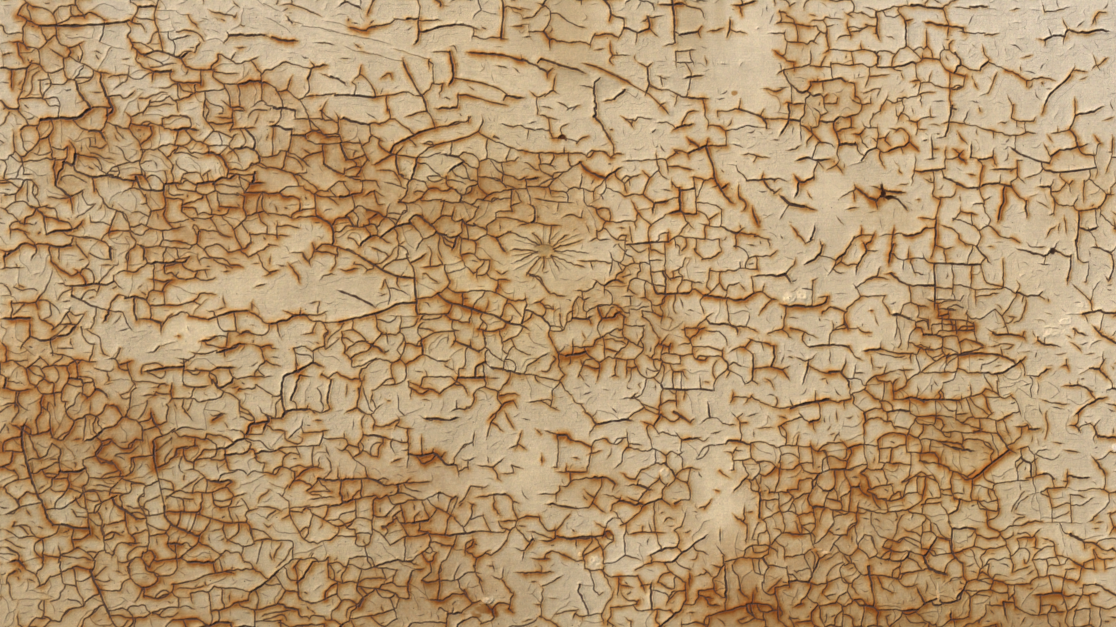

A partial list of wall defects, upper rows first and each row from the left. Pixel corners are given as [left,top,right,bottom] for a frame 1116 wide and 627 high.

crack [94,525,176,616]
crack [133,571,260,627]
crack [350,565,428,627]
crack [393,542,500,627]
crack [459,505,723,627]
rust [597,529,614,539]
crack [755,552,842,627]
crack [875,565,1046,627]
crack [961,528,1036,594]
crack [977,552,1060,626]
crack [1011,525,1088,627]
crack [1057,523,1116,627]